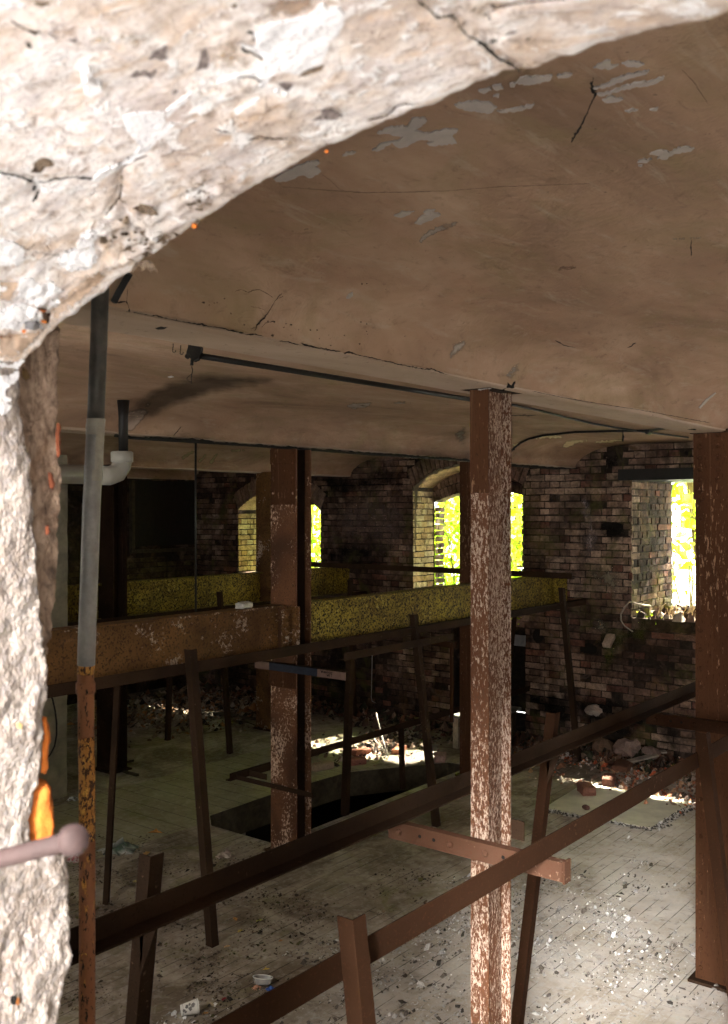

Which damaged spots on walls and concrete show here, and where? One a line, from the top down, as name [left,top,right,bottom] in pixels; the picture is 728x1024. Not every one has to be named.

crack [418,0,565,72]
peeling [454,72,573,114]
crack [571,78,597,142]
peeling [593,59,665,113]
peeling [372,116,458,152]
crack [0,172,92,202]
peeling [273,159,321,182]
peeling [637,146,695,167]